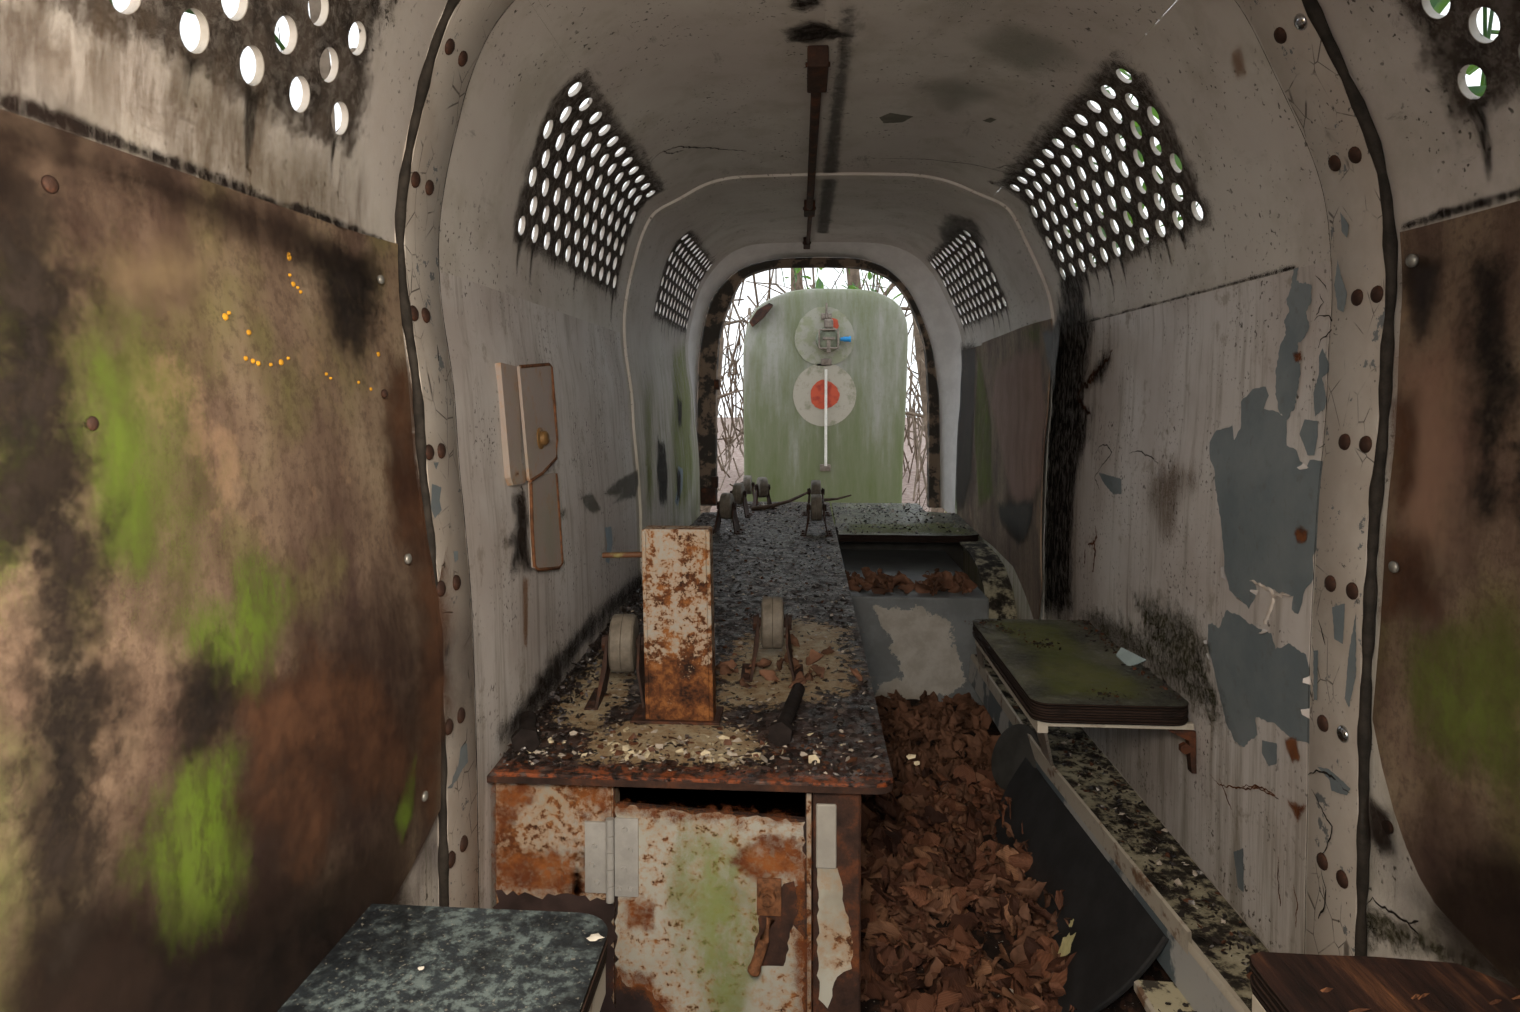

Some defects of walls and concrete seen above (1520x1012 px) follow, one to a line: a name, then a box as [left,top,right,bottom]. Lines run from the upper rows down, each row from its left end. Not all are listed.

damp [1388,0,1520,230]
damp [0,0,460,1012]
damp [926,43,1294,739]
peeling [1203,267,1329,766]
damp [1376,237,1520,628]
peeling [1332,604,1356,707]
rust [490,783,816,1012]
peeling [1233,848,1244,892]
peeling [1318,767,1350,795]
damp [1365,792,1398,858]
damp [1366,902,1500,976]